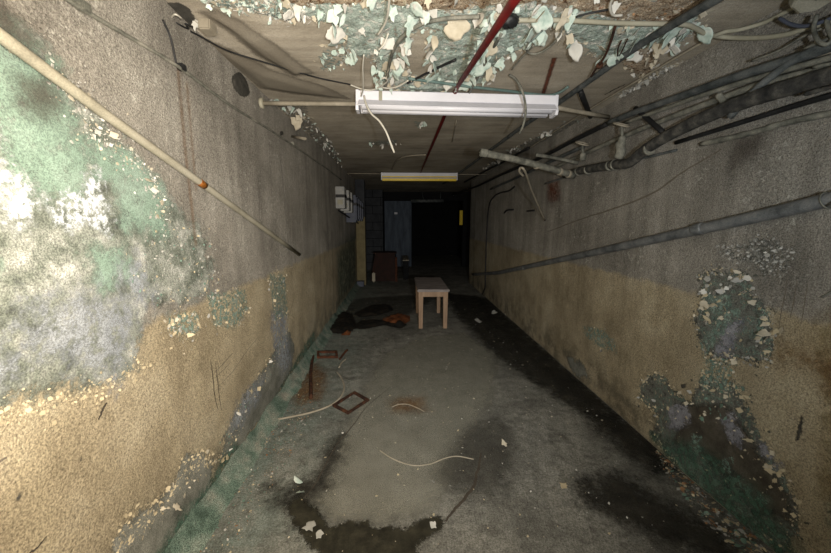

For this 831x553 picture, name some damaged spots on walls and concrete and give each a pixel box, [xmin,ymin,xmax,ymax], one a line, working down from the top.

peeling [0,10,94,97]
peeling [200,0,725,98]
water stain [0,158,114,235]
peeling [0,44,252,442]
water stain [30,262,154,375]
peeling [110,266,315,553]
water stain [448,293,676,474]
peeling [634,232,819,553]
peeling [302,521,324,539]
water stain [267,435,444,553]
water stain [574,471,739,553]